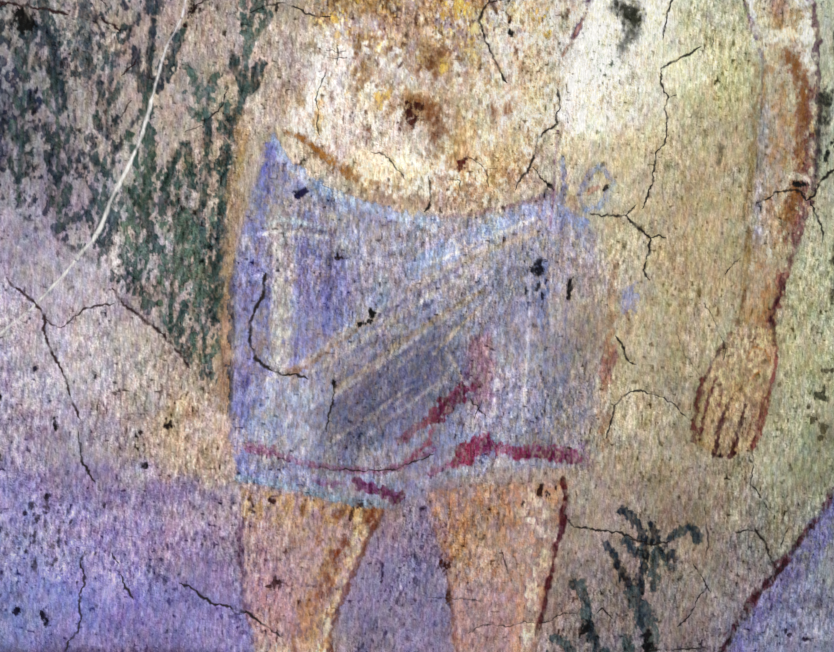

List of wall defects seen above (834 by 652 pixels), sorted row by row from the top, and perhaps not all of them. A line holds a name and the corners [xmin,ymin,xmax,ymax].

crack [478,0,510,83]
crack [663,0,673,38]
crack [515,89,561,190]
crack [591,35,714,281]
crack [760,169,834,236]
crack [248,272,308,379]
crack [7,278,190,482]
crack [180,583,280,636]